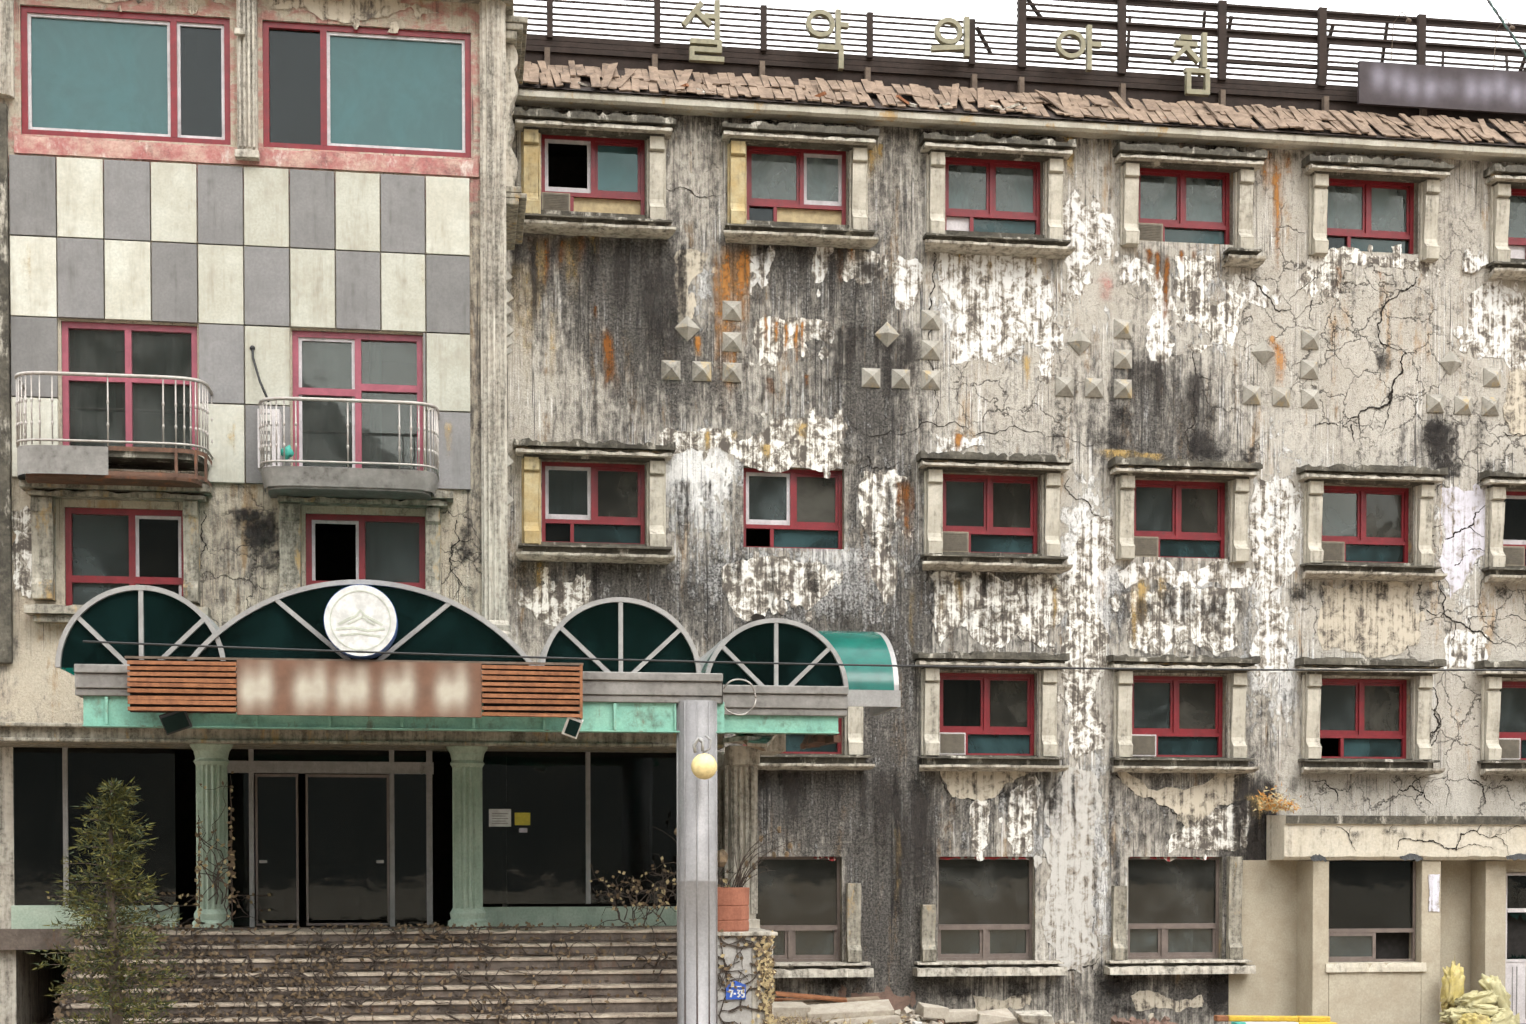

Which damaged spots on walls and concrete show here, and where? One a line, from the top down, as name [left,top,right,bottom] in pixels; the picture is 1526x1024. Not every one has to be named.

corrosion [1263,154,1291,242]
corrosion [603,331,614,382]
corrosion [714,251,750,363]
peeling [812,189,1281,385]
crack [1319,277,1417,442]
peeling [659,407,848,479]
damp [1184,373,1256,463]
damp [1422,418,1505,479]
crack [1427,506,1526,646]
peeling [930,478,1304,974]
crack [1389,687,1521,855]
damp [822,977,841,994]